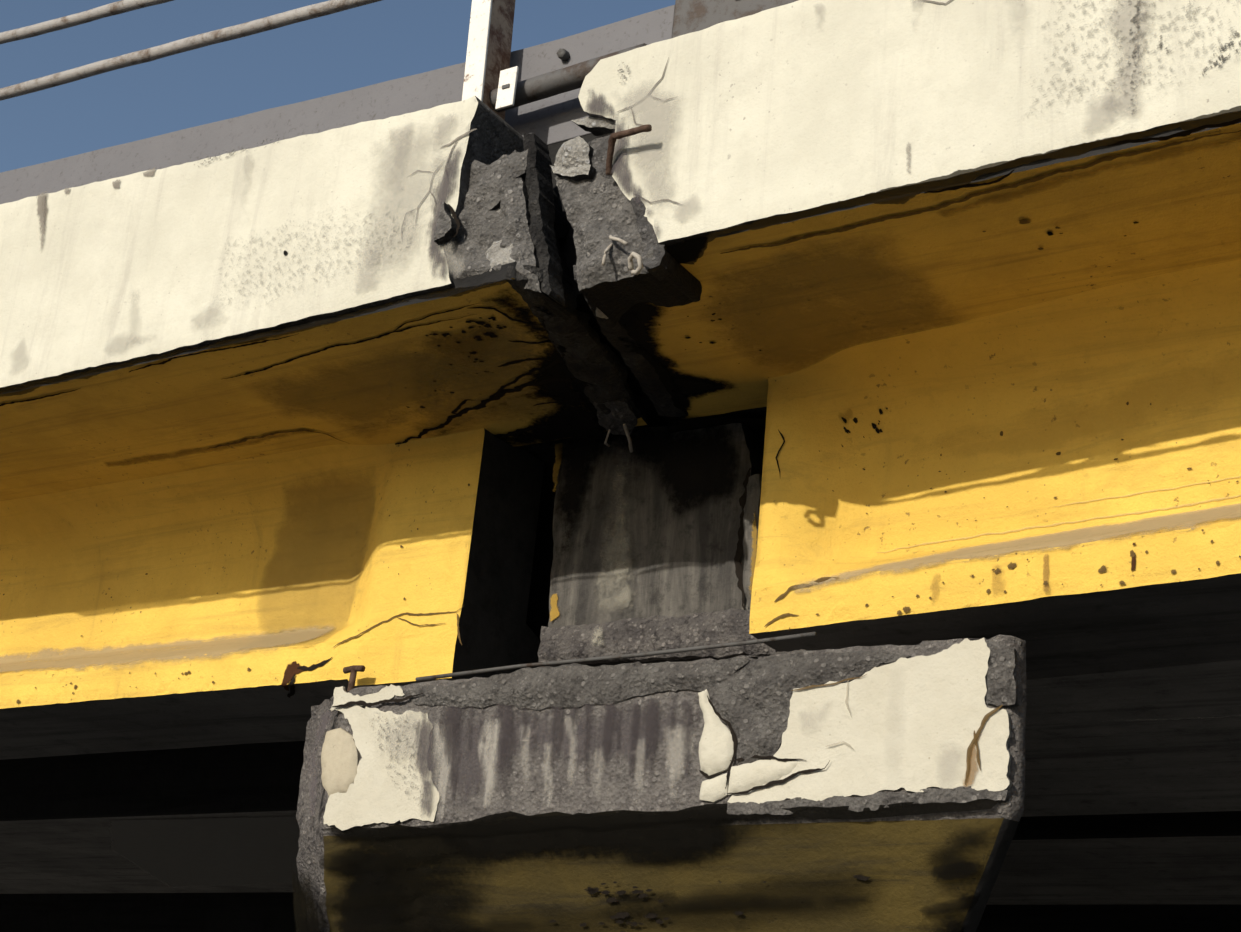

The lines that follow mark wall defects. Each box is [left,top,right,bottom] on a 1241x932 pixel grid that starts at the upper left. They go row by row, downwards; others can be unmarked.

damp [1111,0,1145,114]
crack [401,129,476,241]
crack [720,130,1241,254]
spalling [0,106,1241,452]
crack [223,303,585,445]
damp [618,311,721,421]
damp [598,476,630,608]
crack [281,608,462,698]
crack [332,693,423,708]
spalling [985,639,1020,707]
damp [300,699,999,932]
spalling [727,786,1010,821]